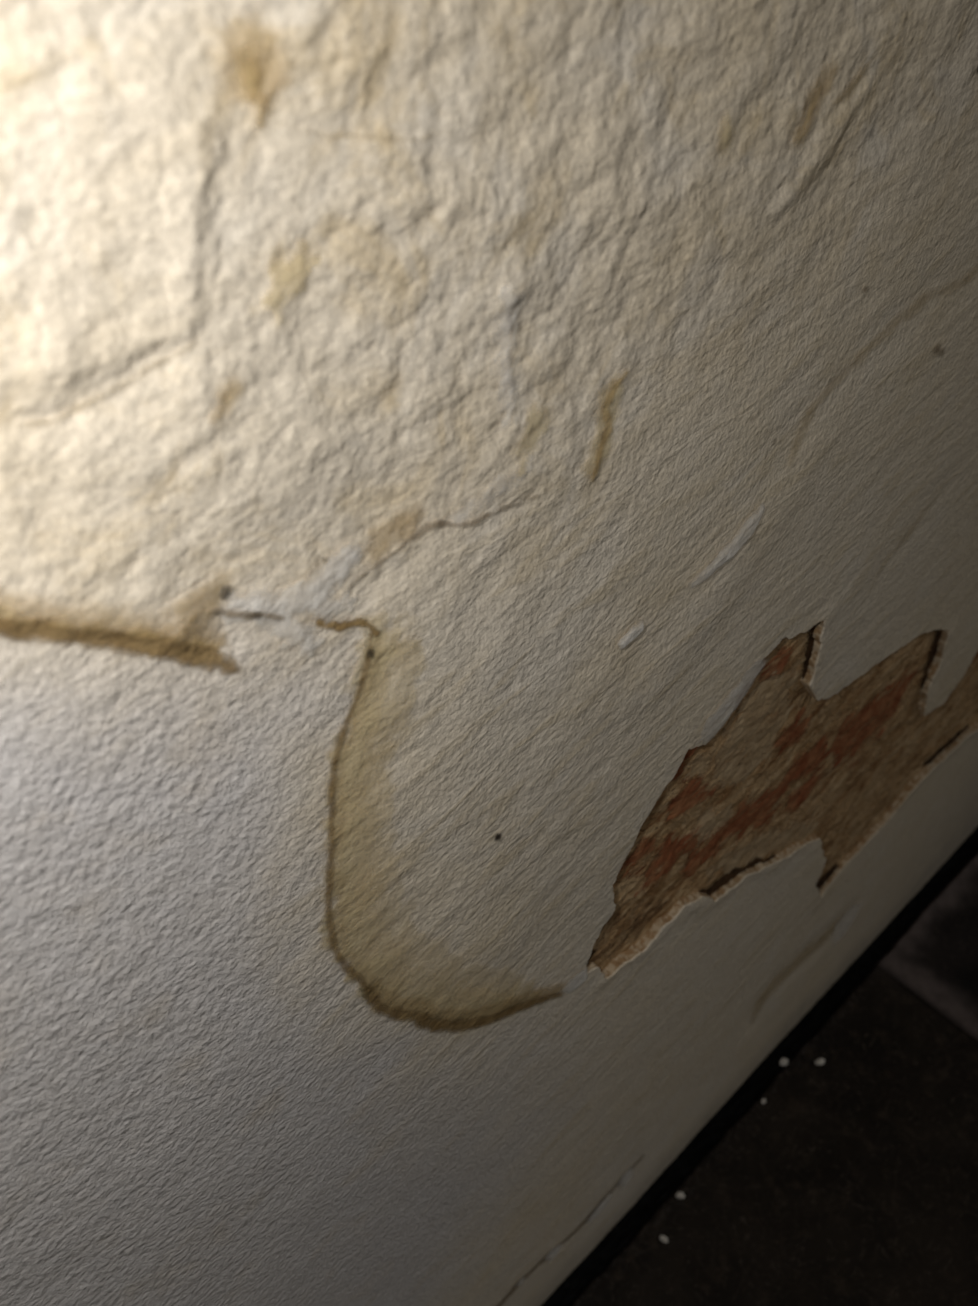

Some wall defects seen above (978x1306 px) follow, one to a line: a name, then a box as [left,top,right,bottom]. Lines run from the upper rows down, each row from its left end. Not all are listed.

damp [0,607,237,673]
damp [330,630,390,895]
crack [315,618,562,1032]
spalling [586,620,978,979]